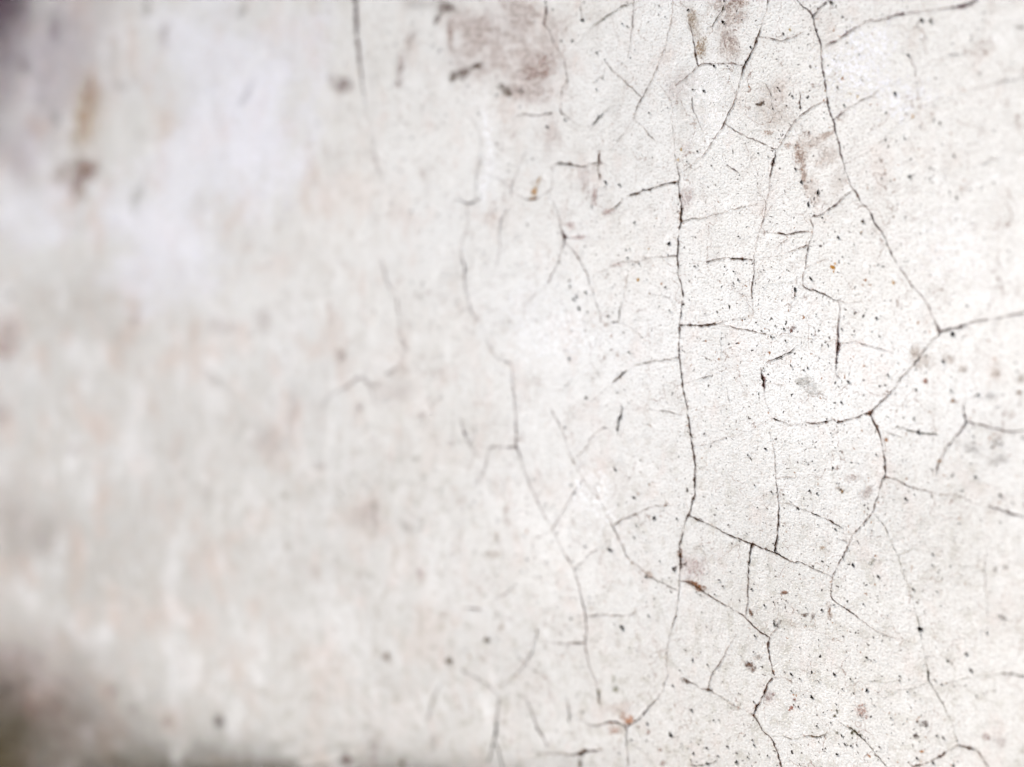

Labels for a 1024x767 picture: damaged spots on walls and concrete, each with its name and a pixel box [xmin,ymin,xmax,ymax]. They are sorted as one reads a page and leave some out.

crack [353,0,366,111]
crack [460,0,1024,767]